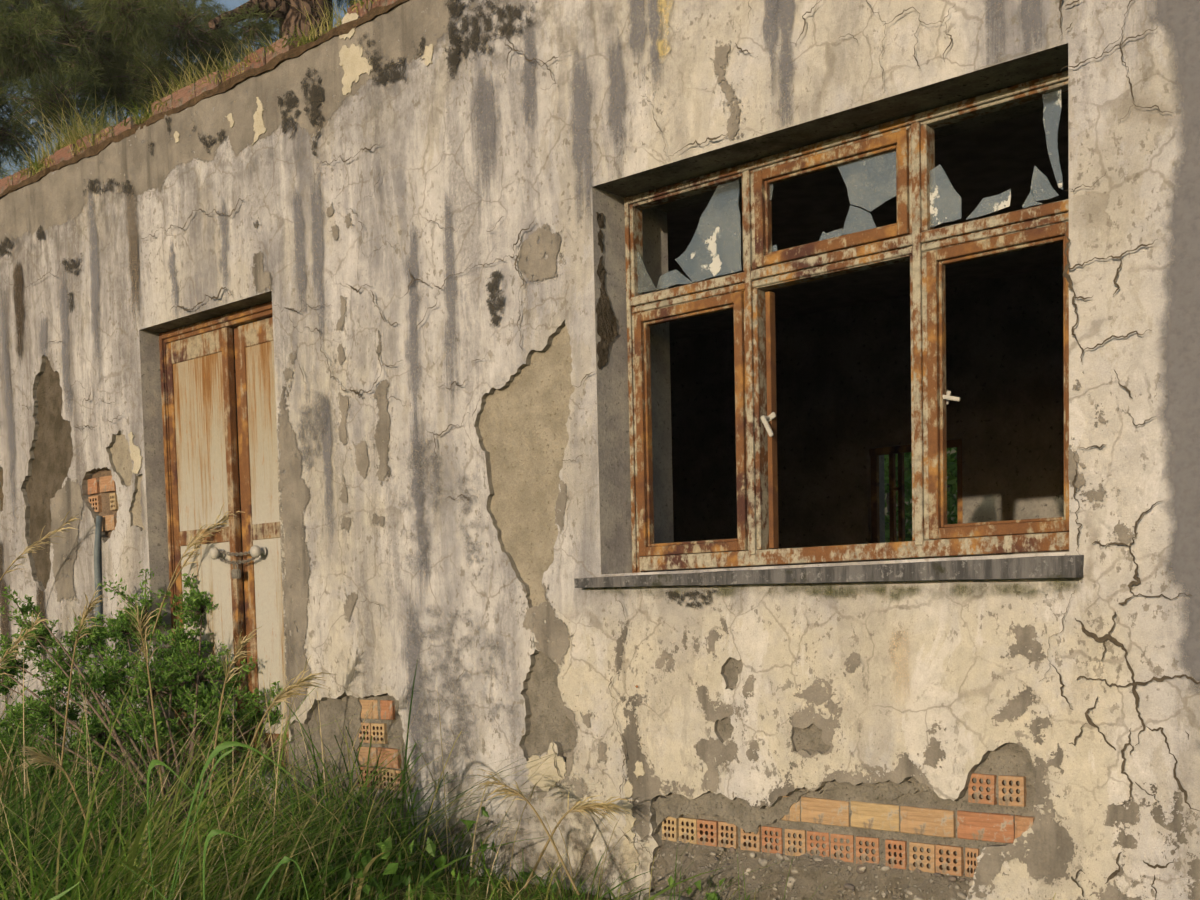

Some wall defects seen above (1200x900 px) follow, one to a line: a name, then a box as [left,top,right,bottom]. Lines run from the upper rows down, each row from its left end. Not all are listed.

peeling [0,0,461,250]
damp [445,0,536,127]
crack [839,0,955,89]
crack [1059,0,1173,125]
damp [0,237,24,497]
spalling [26,357,118,603]
damp [38,178,139,410]
spalling [277,343,417,863]
damp [486,271,504,326]
spalling [479,326,1200,900]
crack [1040,444,1200,811]
crack [1071,852,1175,900]